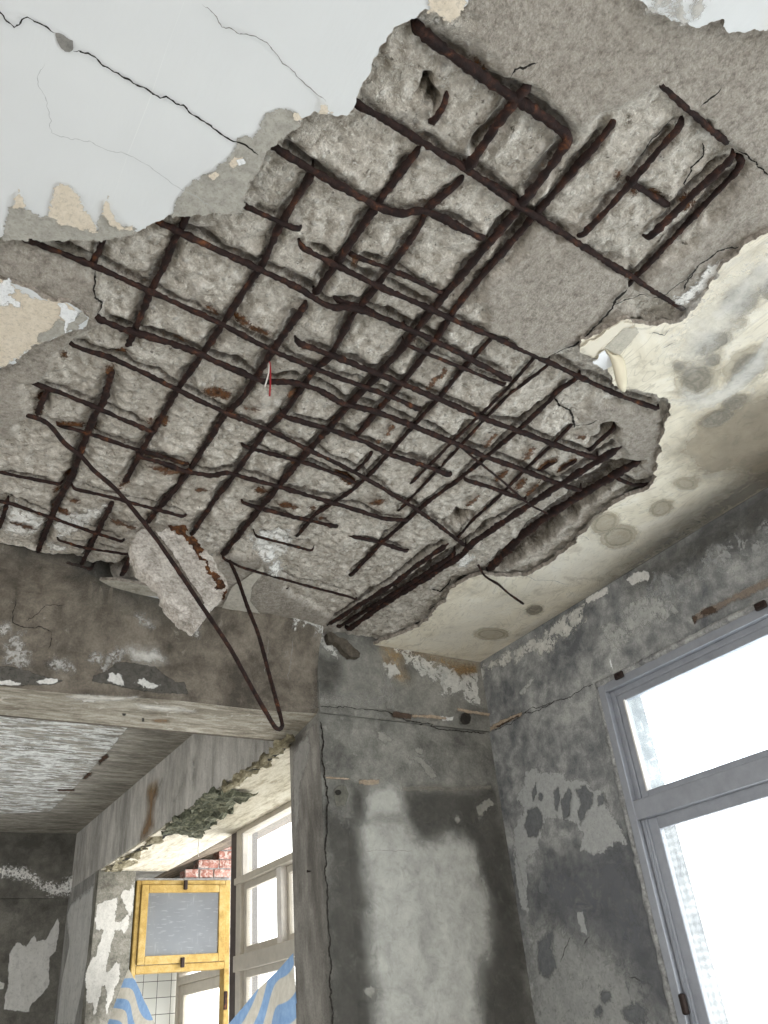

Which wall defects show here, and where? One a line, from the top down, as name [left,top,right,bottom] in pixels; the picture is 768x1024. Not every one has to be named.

crack [0,12,54,33]
crack [37,3,325,205]
corrosion [52,469,80,516]
corrosion [201,386,232,400]
spalling [0,0,768,731]
corrosion [495,446,577,496]
damp [592,513,636,548]
damp [603,258,768,588]
peeling [0,882,135,1024]
damp [327,782,526,1024]
crack [318,684,593,1024]
peeling [512,768,651,1024]